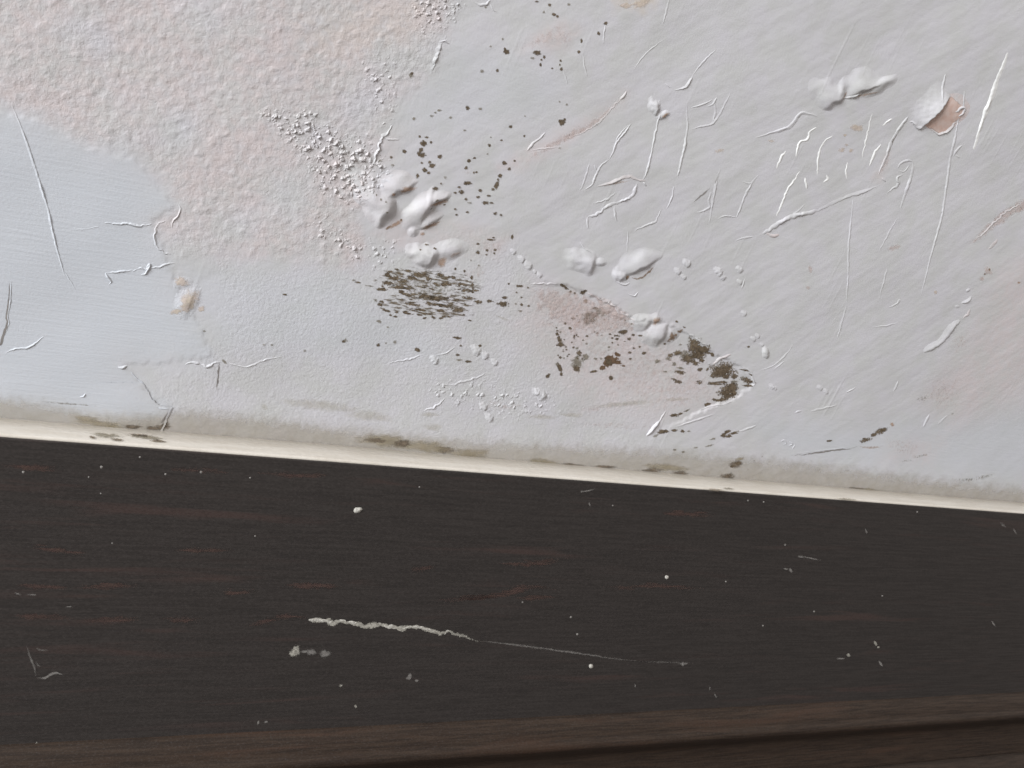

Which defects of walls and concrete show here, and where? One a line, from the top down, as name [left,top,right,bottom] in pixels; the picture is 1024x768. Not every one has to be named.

mould [353,237,530,328]
mould [546,284,753,406]